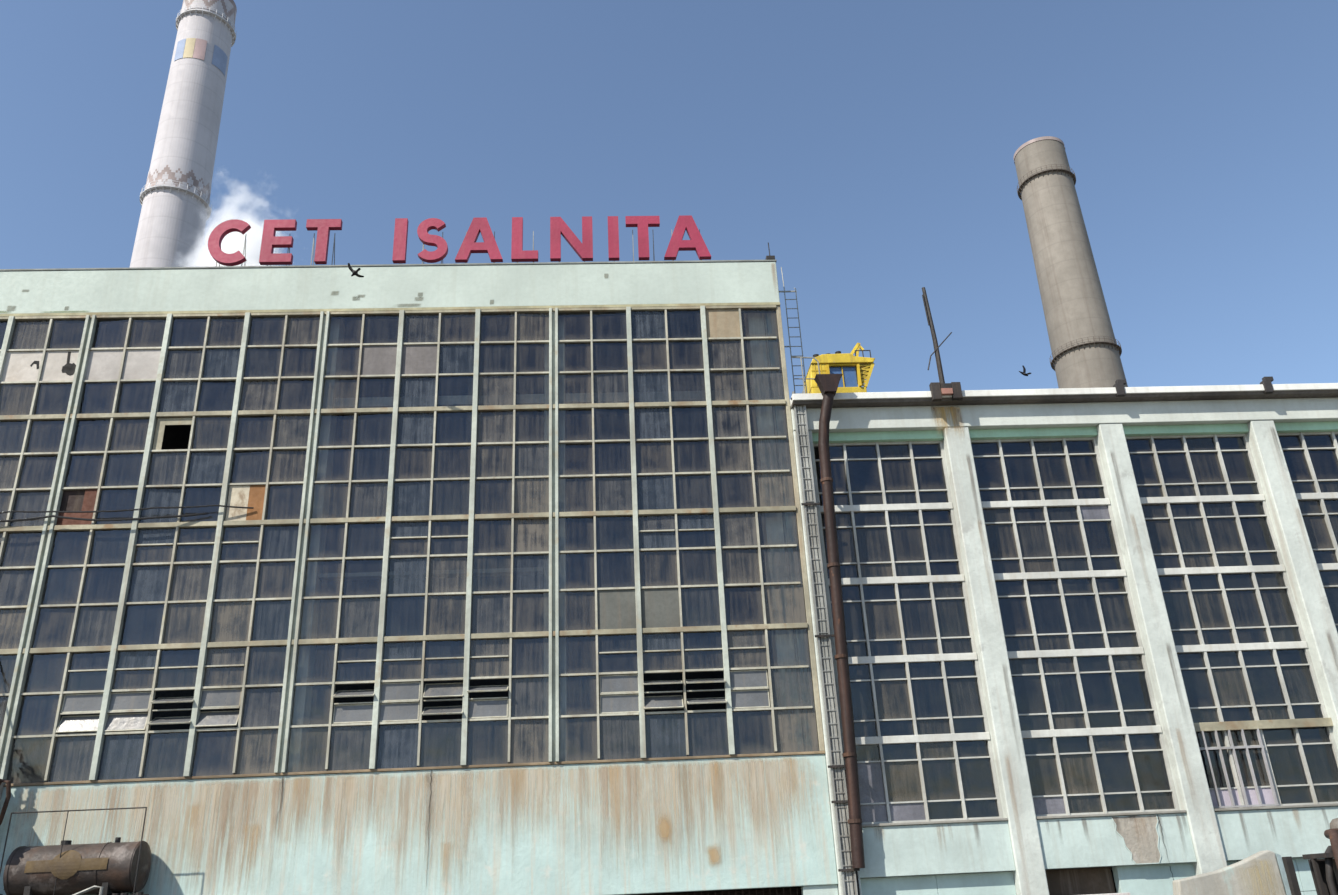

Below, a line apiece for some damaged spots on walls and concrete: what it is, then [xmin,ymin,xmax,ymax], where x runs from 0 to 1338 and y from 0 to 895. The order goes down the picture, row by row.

rust [934,407,957,426]
rust [213,766,643,856]
rust [709,849,719,863]
spalling [1111,814,1162,865]